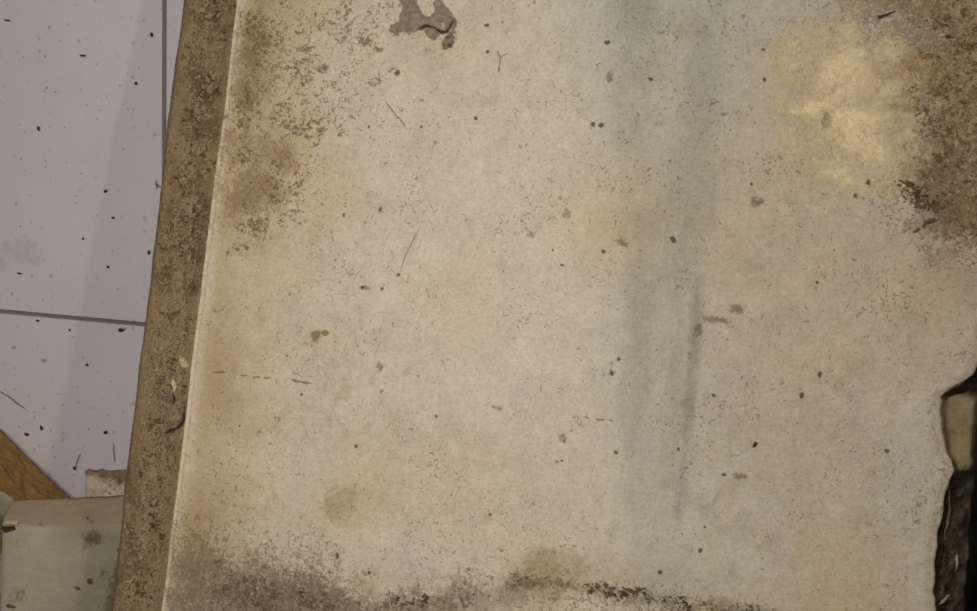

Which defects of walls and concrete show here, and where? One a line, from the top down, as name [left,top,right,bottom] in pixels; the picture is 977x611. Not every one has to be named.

water stain [779,0,977,250]